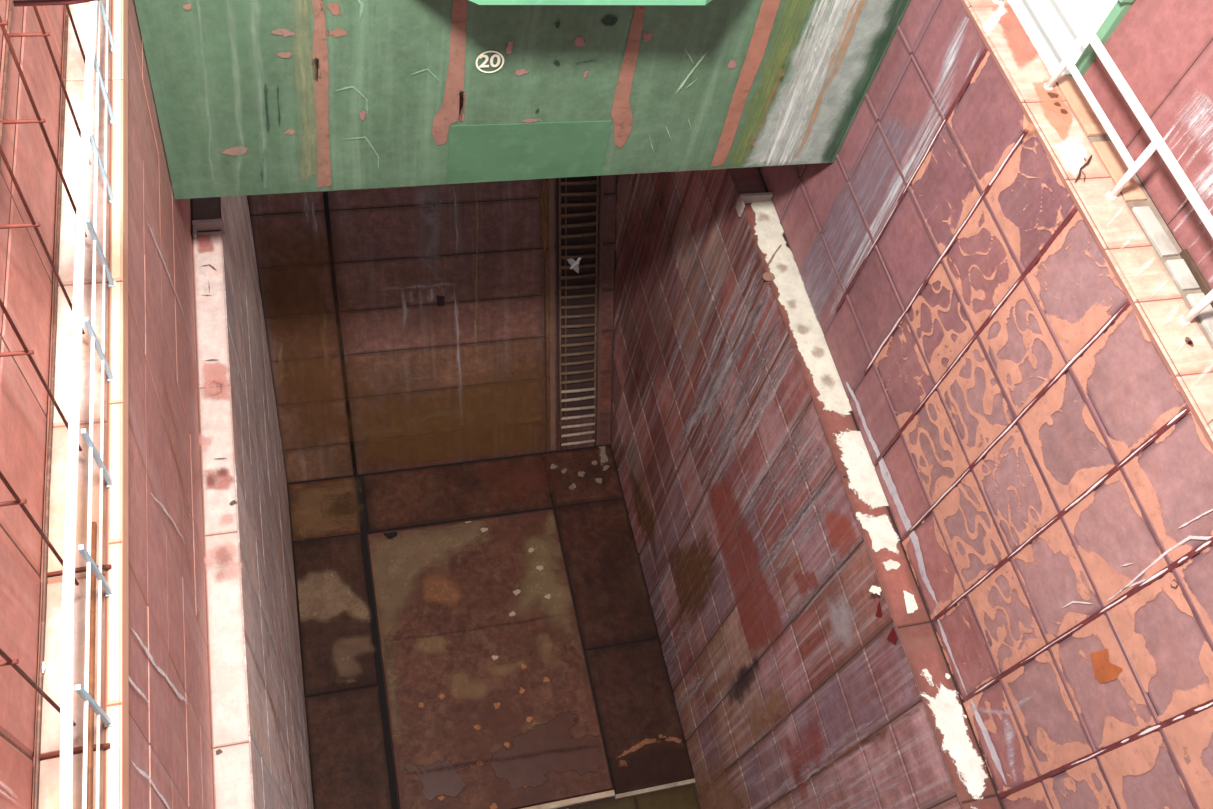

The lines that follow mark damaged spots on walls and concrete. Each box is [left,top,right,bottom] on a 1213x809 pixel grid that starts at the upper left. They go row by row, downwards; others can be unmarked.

rust [795,0,865,158]
peeling [970,51,990,83]
peeling [1034,81,1072,139]
water stain [1155,98,1213,232]
peeling [751,108,1213,809]
rust [424,575,461,603]
rust [1090,649,1122,683]